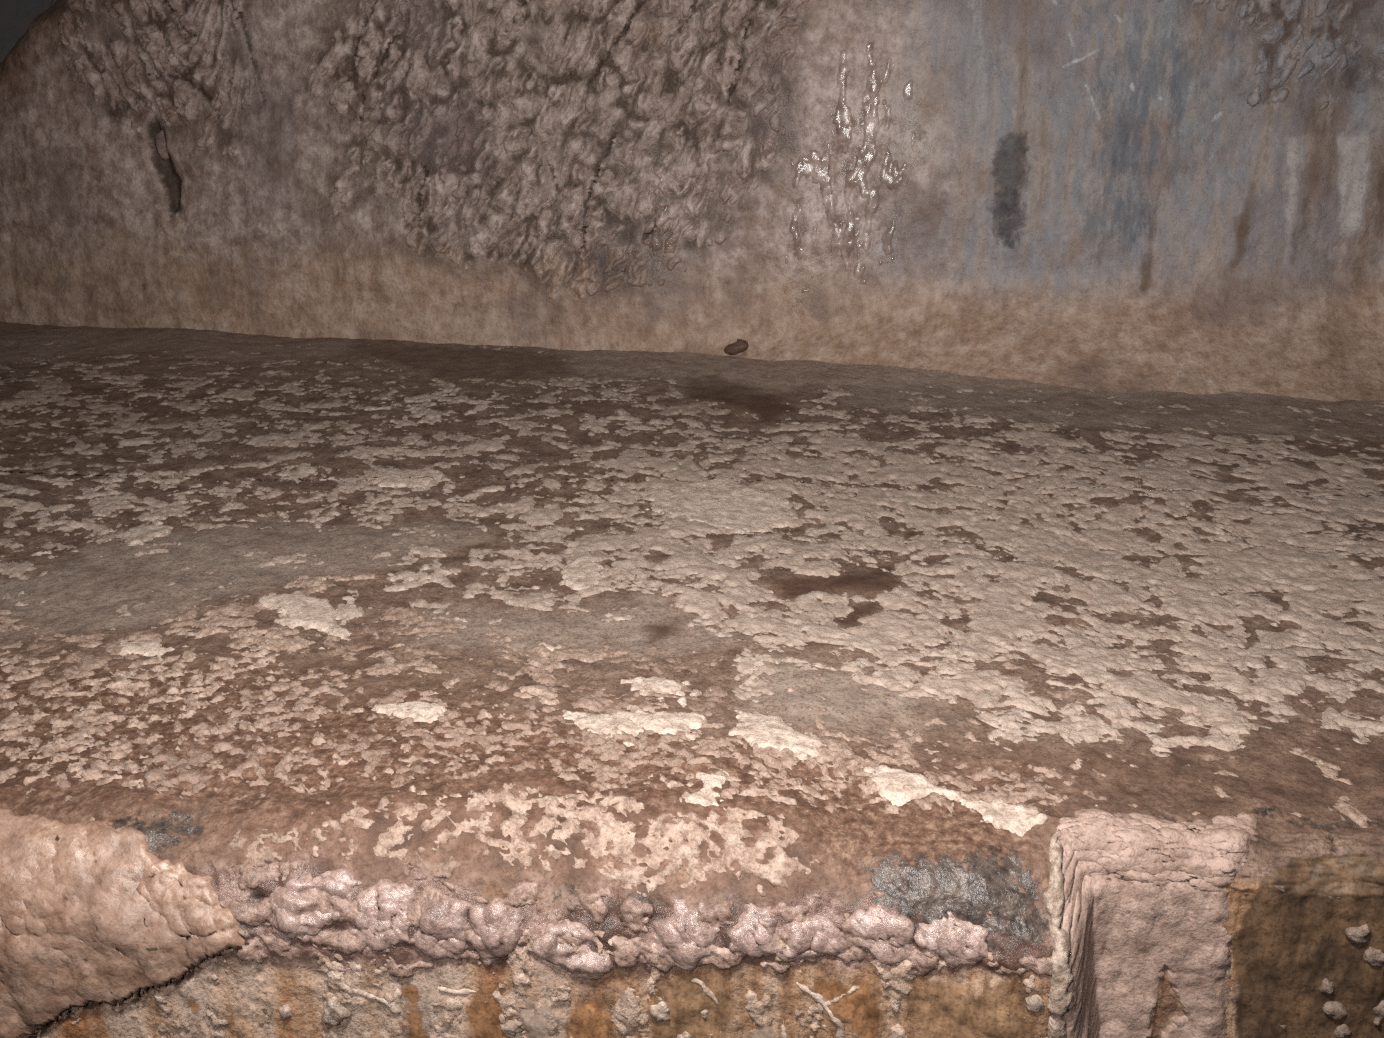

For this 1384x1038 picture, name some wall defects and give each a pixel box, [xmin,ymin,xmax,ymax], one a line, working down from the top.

leakage [785,42,921,284]
leakage [994,134,1026,248]
leakage [1336,133,1384,235]
peeling [0,339,1384,1038]
leakage [861,808,1384,1038]
corrosion [1232,854,1384,1038]
leakage [321,989,402,1026]
corrosion [466,994,510,1038]
leakage [649,1001,691,1038]
corrosion [652,973,737,1038]
corrosion [815,980,884,1038]
corrosion [909,982,1035,1038]